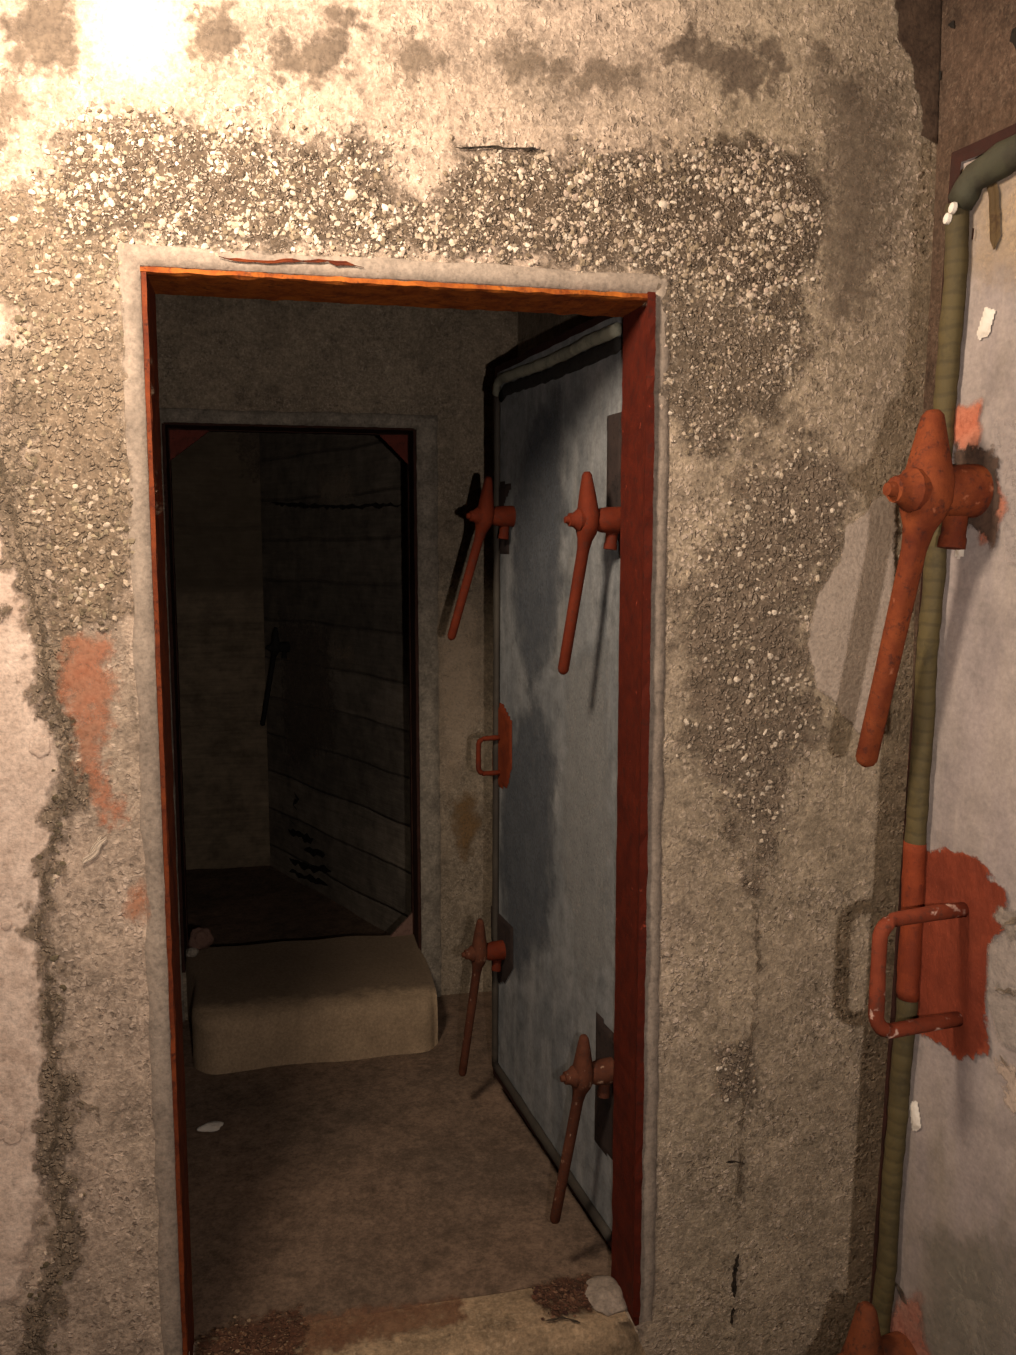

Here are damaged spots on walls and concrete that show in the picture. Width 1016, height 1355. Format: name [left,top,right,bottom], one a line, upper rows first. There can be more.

damp [1,0,240,89]
damp [267,5,366,89]
damp [399,31,444,77]
damp [496,34,640,96]
damp [0,86,26,144]
corrosion [60,633,121,824]
spalling [0,97,897,1302]
crack [726,888,762,1325]